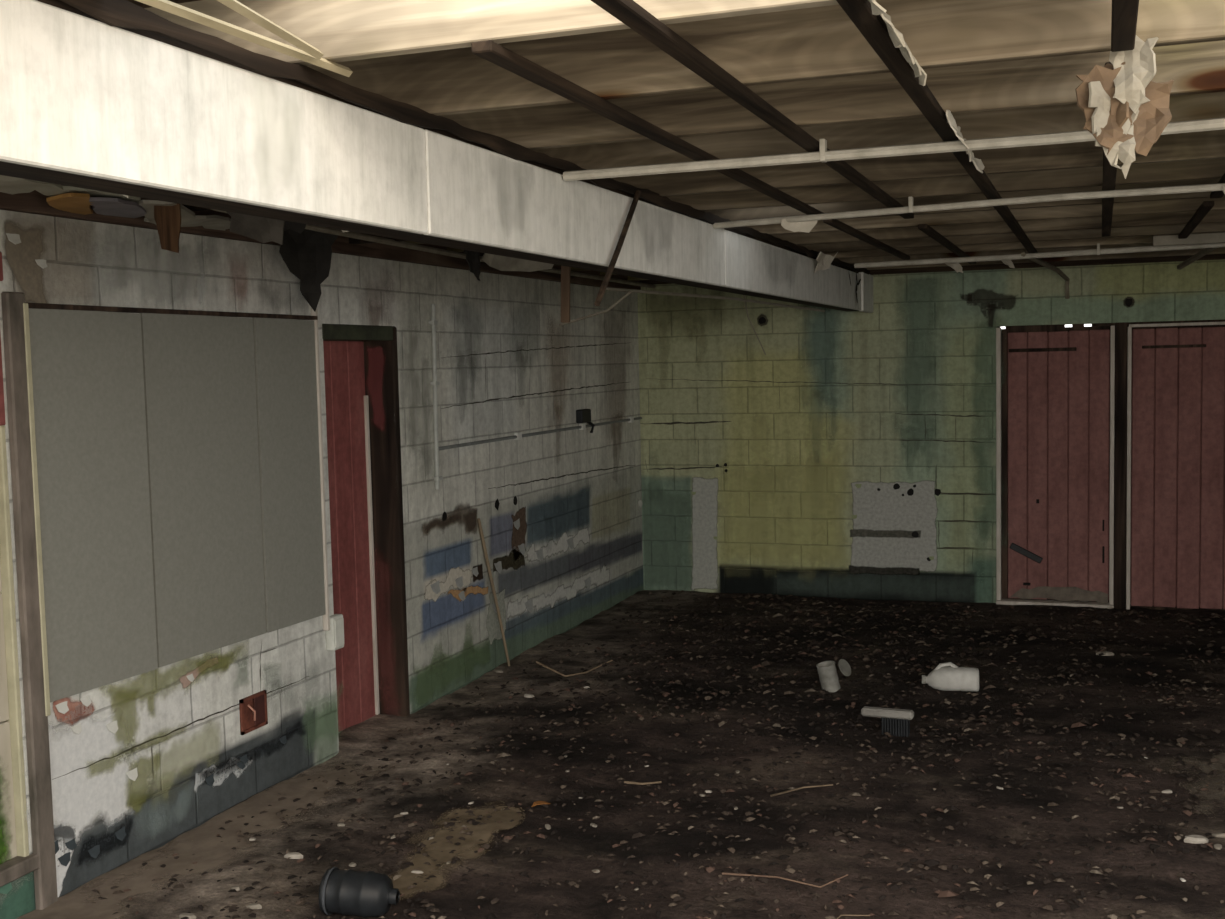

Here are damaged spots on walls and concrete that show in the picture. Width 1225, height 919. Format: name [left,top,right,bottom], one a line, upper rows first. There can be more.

peeling [4,221,47,304]
peeling [422,496,590,601]
peeling [507,566,610,619]
flaking render [48,695,138,897]
peeling [194,722,306,791]